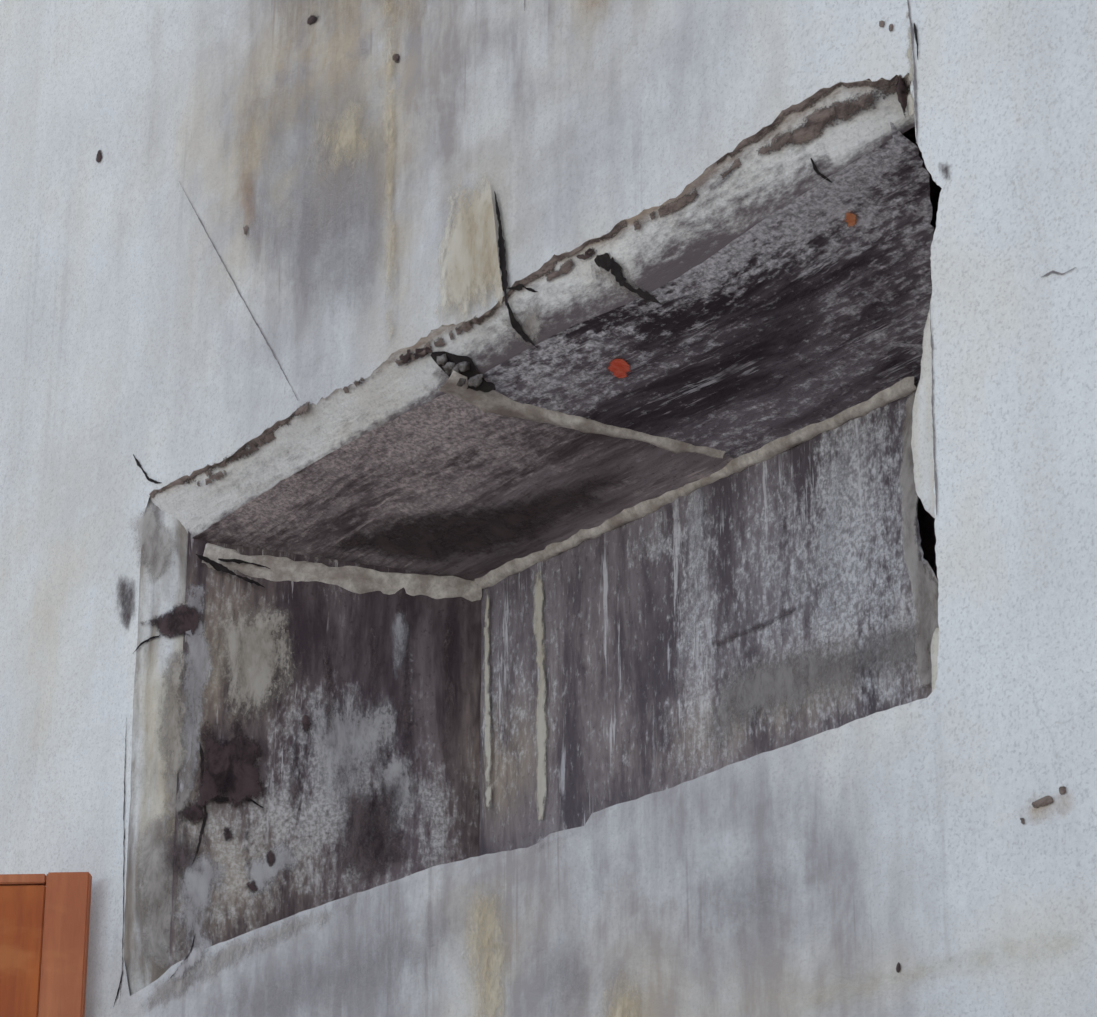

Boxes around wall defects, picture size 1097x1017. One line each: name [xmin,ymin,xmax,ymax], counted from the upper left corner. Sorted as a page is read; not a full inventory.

spalling [716,75,910,180]
crack [181,185,298,400]
crack [494,191,538,348]
spalling [395,188,699,392]
peeling [132,402,310,577]
spalling [911,295,935,518]
peeling [134,585,296,977]
peeling [301,697,410,872]
damp [533,572,547,820]
spalling [931,628,939,692]